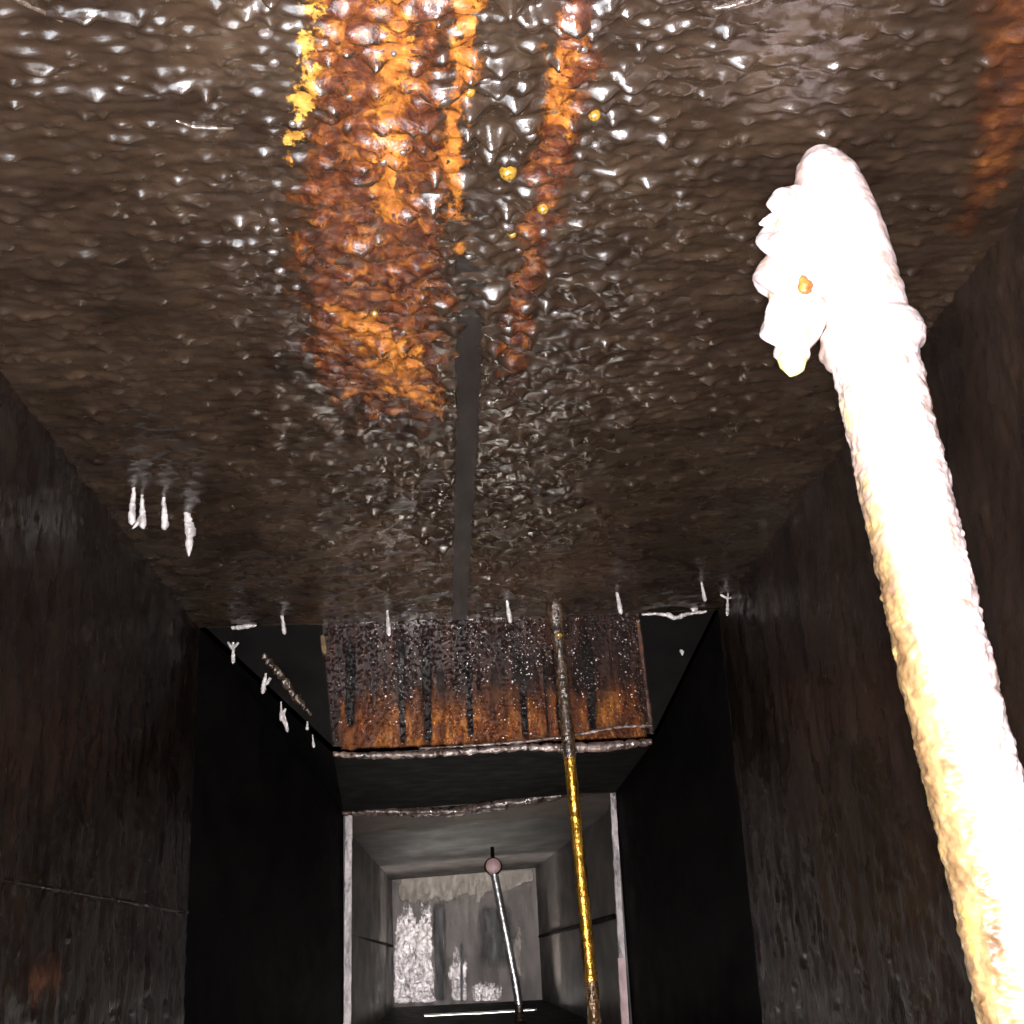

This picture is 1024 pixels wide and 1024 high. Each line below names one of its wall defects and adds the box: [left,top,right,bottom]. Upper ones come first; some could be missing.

corrosion [282,0,487,436]
corrosion [494,0,602,382]
corrosion [337,616,653,750]